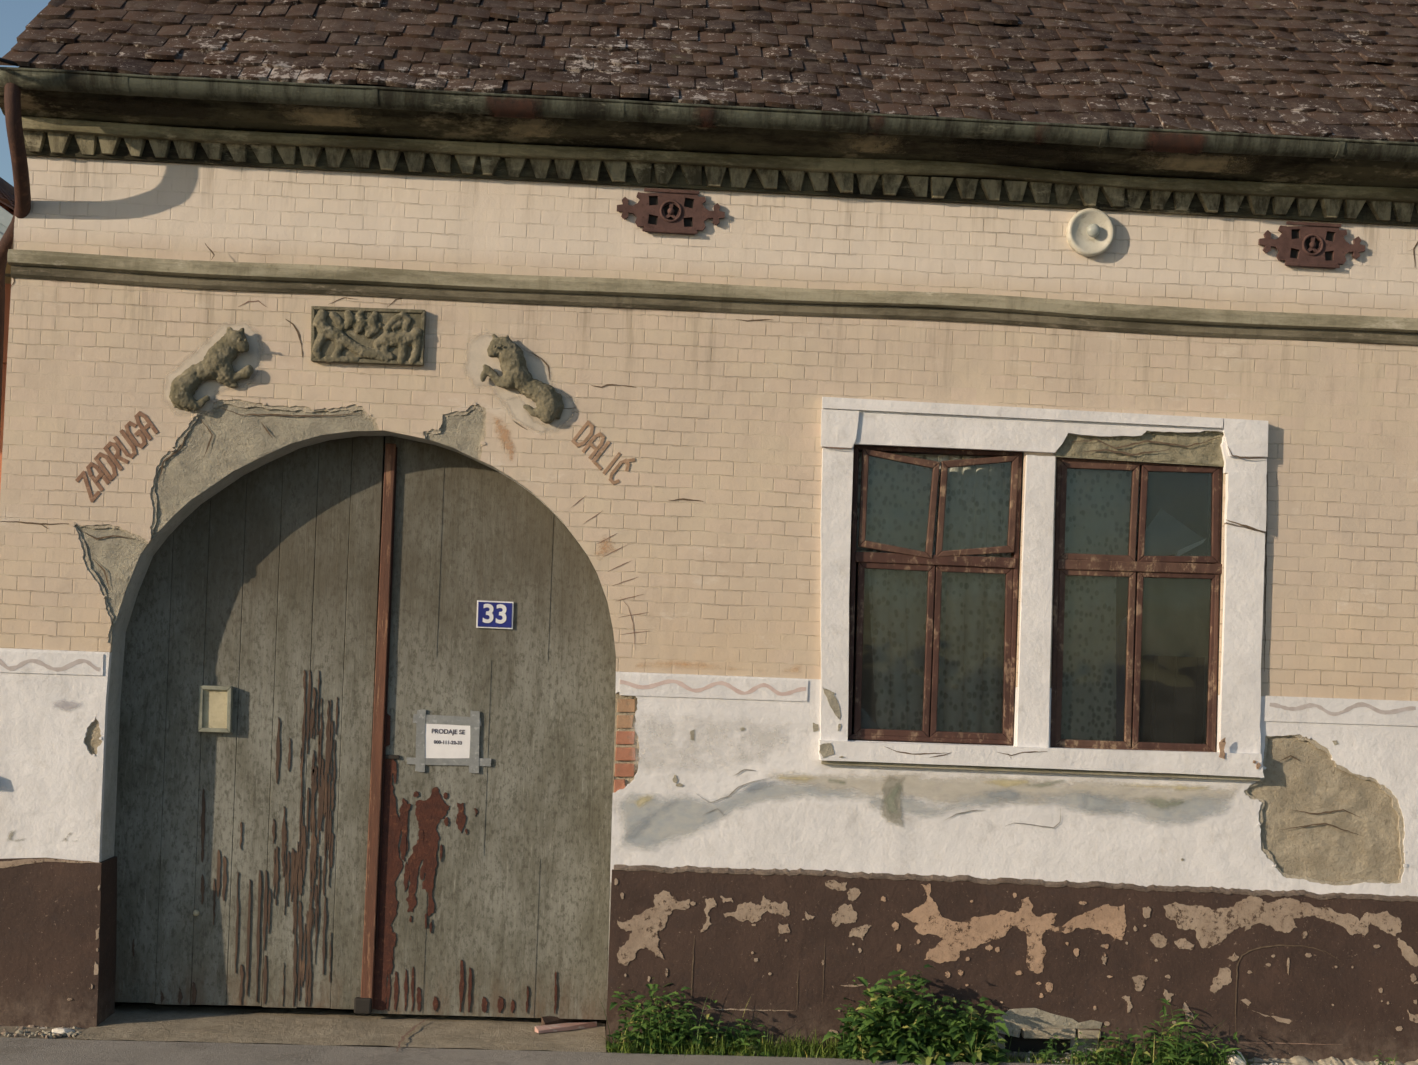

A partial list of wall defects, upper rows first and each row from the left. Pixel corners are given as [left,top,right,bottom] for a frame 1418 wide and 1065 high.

flaking render [613,692,640,793]
leakage [623,775,1232,847]
peeling [617,880,871,982]
peeling [892,884,1418,1063]